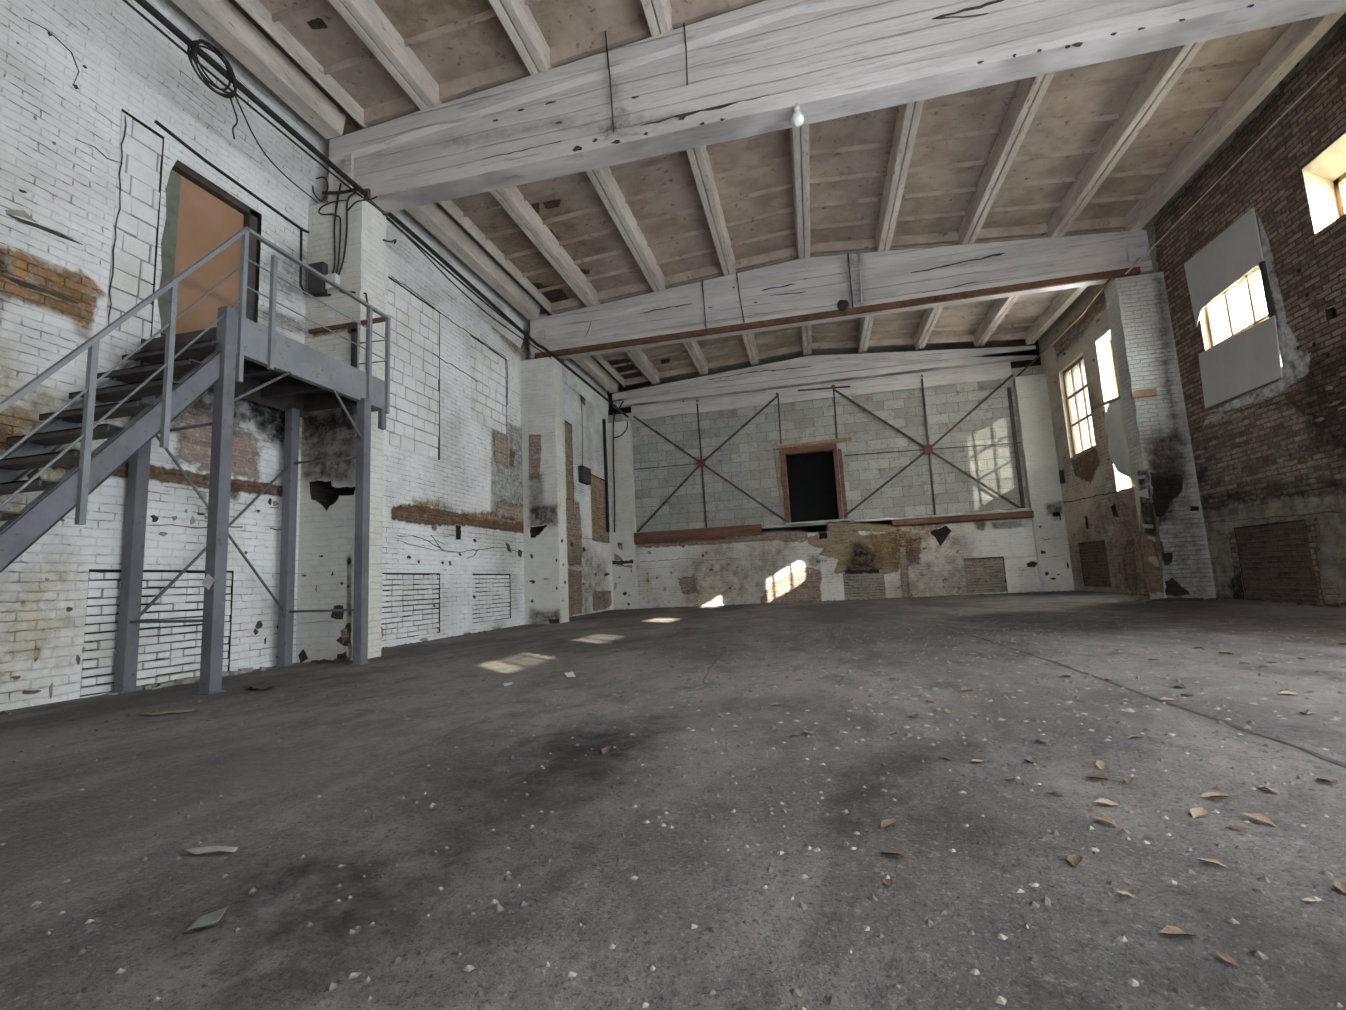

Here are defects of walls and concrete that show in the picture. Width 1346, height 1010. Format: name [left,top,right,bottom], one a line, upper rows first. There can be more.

crack [932,0,1004,19]
peeling [1155,23,1346,511]
spalling [309,480,356,511]
peeling [492,425,633,616]
flaking render [761,523,912,603]
crack [912,619,1346,767]